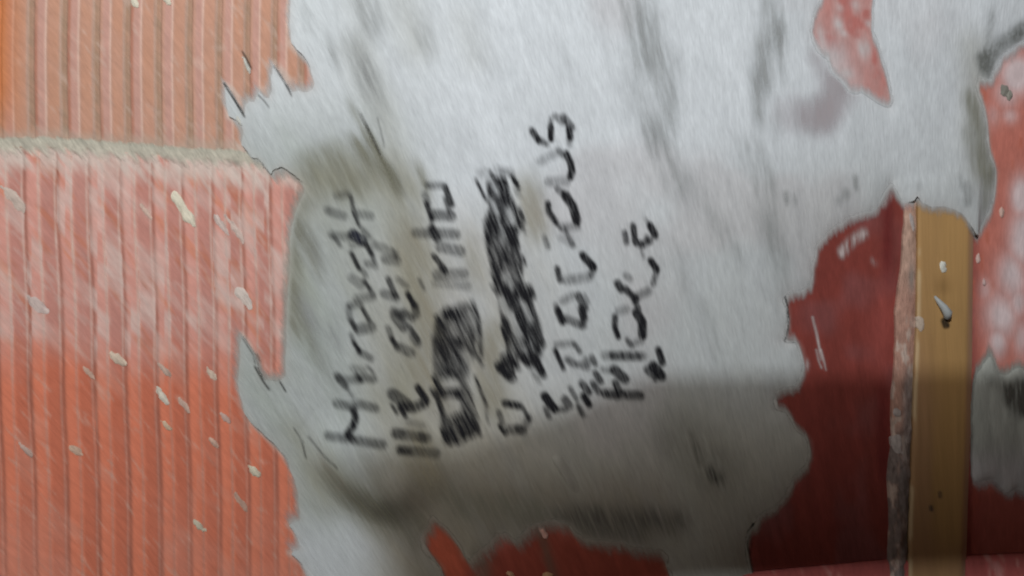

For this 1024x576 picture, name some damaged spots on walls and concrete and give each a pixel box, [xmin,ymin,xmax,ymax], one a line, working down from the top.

peeling [0,0,314,576]
peeling [425,523,670,576]
peeling [743,190,904,576]
peeling [812,0,890,103]
peeling [965,455,1024,576]
peeling [971,46,1024,393]